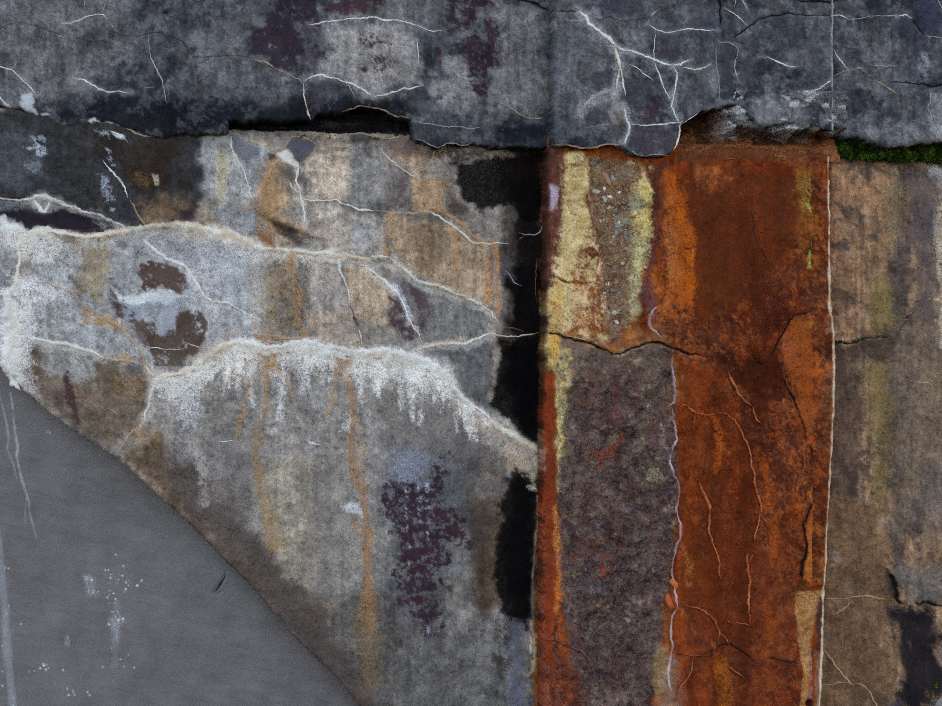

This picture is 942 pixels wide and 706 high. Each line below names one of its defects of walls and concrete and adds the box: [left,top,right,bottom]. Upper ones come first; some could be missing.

crack [0,2,542,245]
crack [519,0,942,156]
water stain [0,204,114,267]
water stain [636,184,653,276]
water stain [0,278,64,390]
water stain [111,148,592,706]
crack [0,133,798,691]
corrosion [545,373,561,663]
crack [754,311,813,579]
corrosion [785,317,813,428]
corrosion [804,513,813,587]
crack [828,574,942,615]